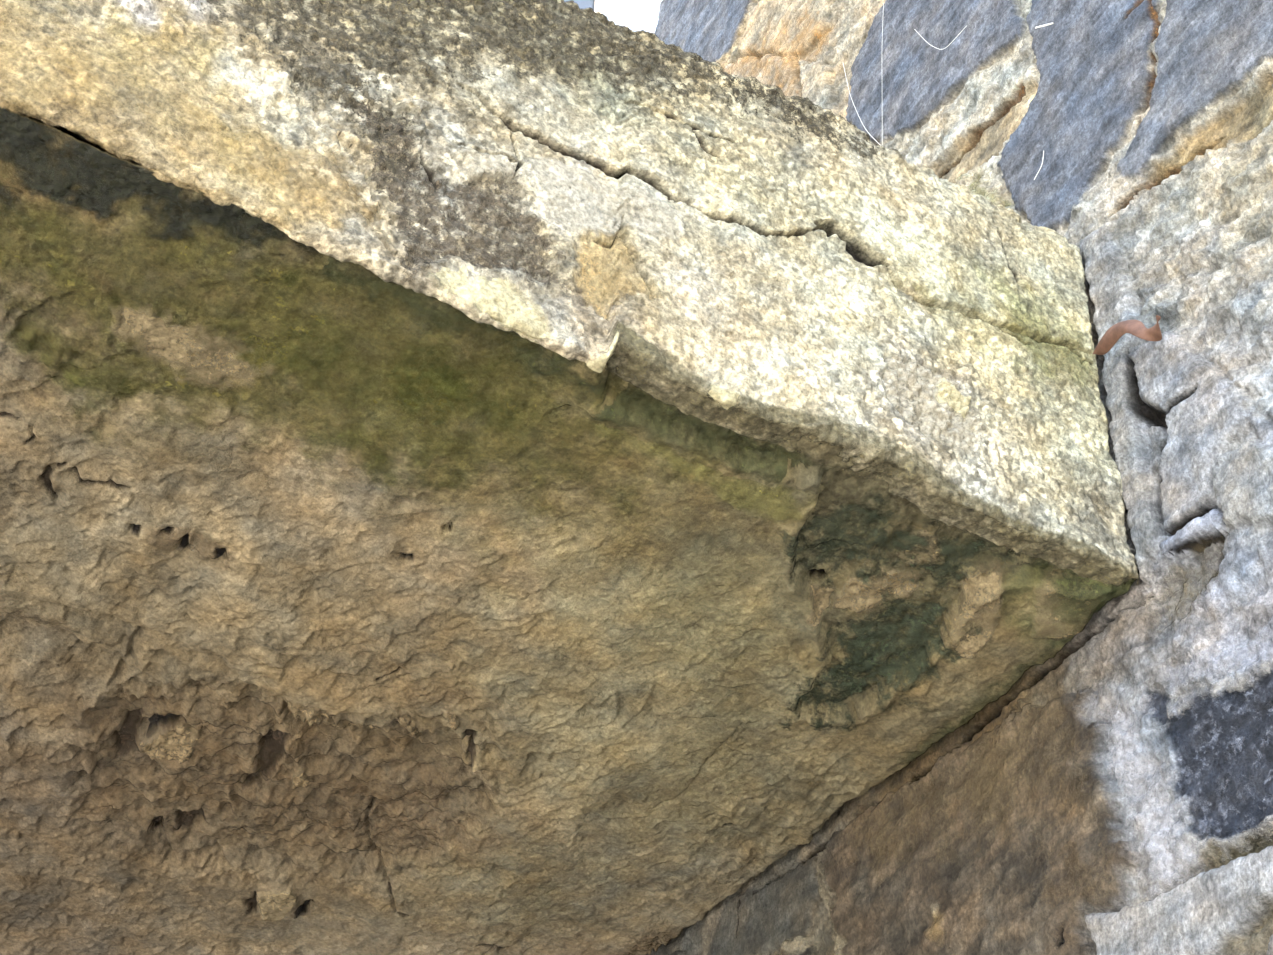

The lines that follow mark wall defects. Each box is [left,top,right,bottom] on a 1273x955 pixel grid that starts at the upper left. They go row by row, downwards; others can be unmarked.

water stain [193,0,898,180]
crack [499,118,623,179]
crack [665,115,721,157]
crack [715,218,879,267]